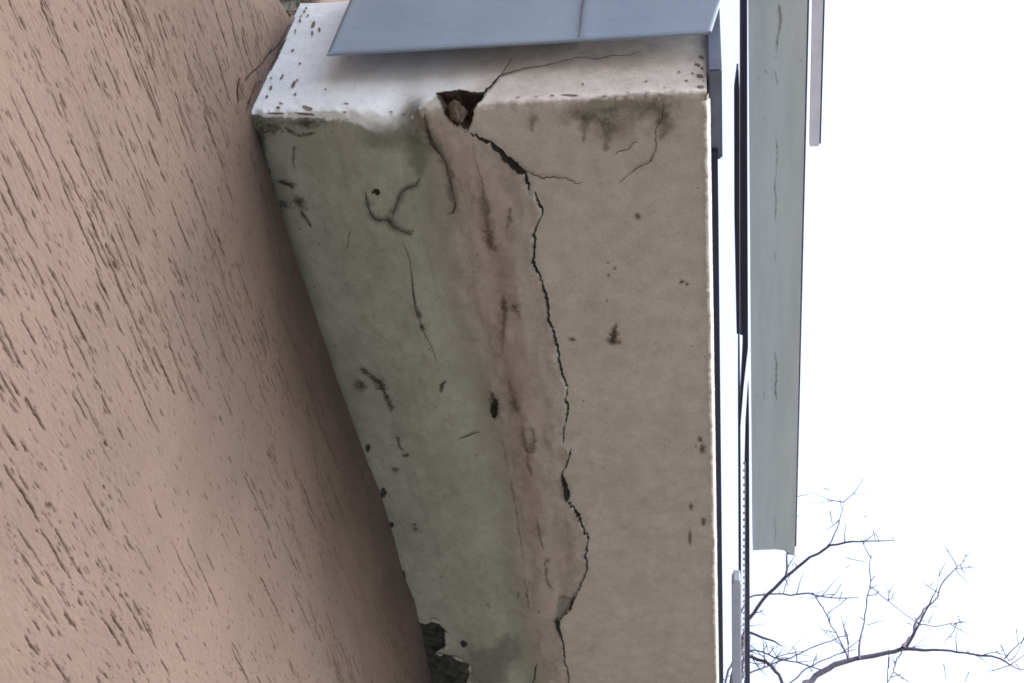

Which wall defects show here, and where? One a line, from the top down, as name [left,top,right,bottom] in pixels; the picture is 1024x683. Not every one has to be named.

crack [423,112,456,215]
spalling [436,89,484,134]
crack [476,52,638,103]
crack [615,104,665,182]
crack [347,179,437,361]
crack [470,132,590,683]
spalling [420,618,471,683]